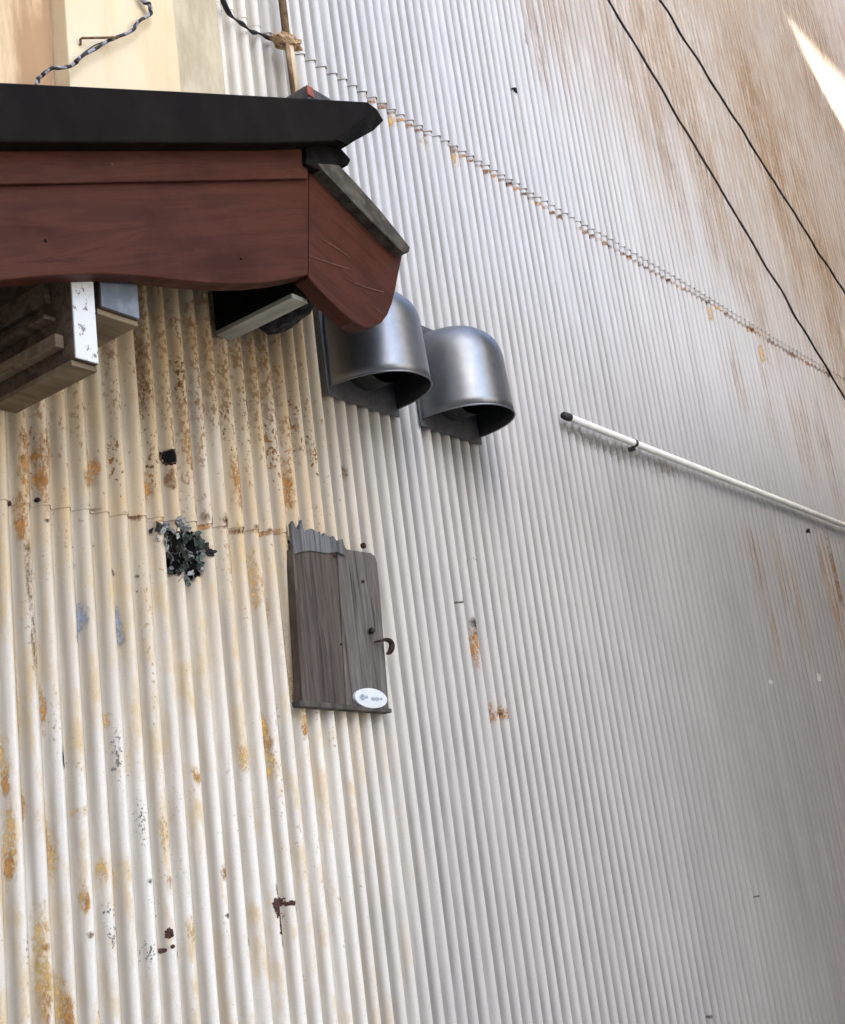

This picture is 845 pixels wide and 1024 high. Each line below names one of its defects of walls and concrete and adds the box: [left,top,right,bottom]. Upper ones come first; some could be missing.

rust [366,94,424,135]
rust [449,147,562,219]
rust [580,227,829,377]
rust [134,332,160,499]
rust [169,355,207,469]
rust [264,391,319,507]
rust [14,420,50,599]
peeling [149,515,218,587]
rust [196,512,288,571]
rust [469,620,480,659]
rust [0,747,9,794]
rust [4,797,24,880]